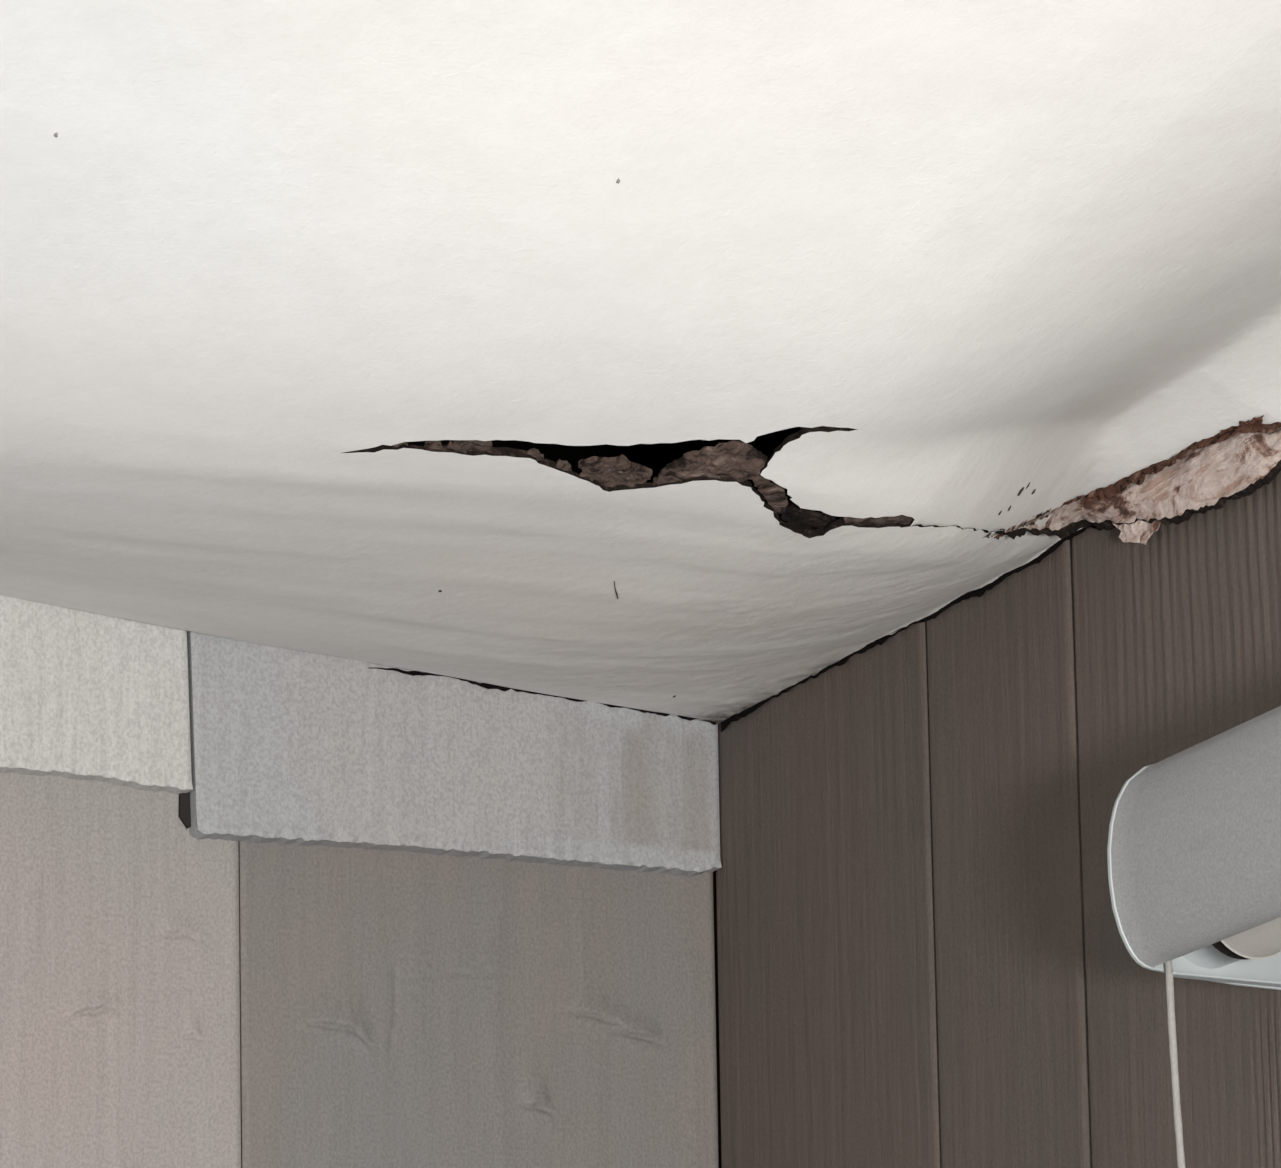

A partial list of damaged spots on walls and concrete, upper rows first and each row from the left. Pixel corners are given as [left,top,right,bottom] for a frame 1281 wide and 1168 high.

crack [343,426,1004,538]
peeling [983,415,1281,545]